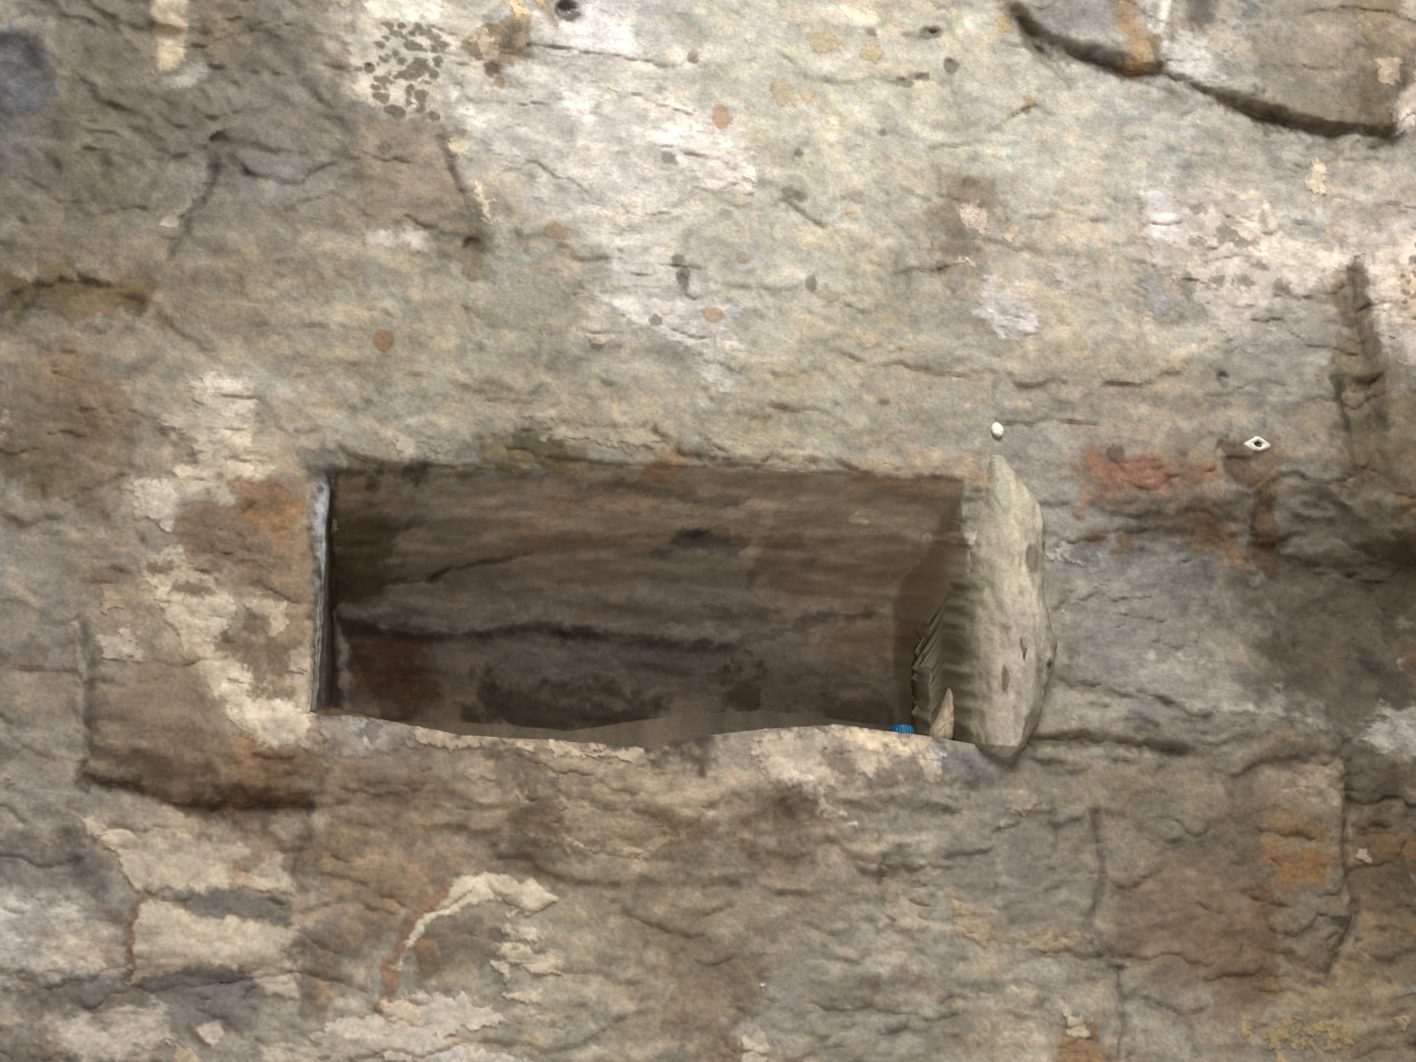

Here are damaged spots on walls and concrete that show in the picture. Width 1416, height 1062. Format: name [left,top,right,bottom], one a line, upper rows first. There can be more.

corrosion [1079,436,1286,578]
spalling [165,1019,223,1062]
flaking render [259,872,572,1062]
crack [1085,809,1162,1062]
crack [1327,762,1359,978]